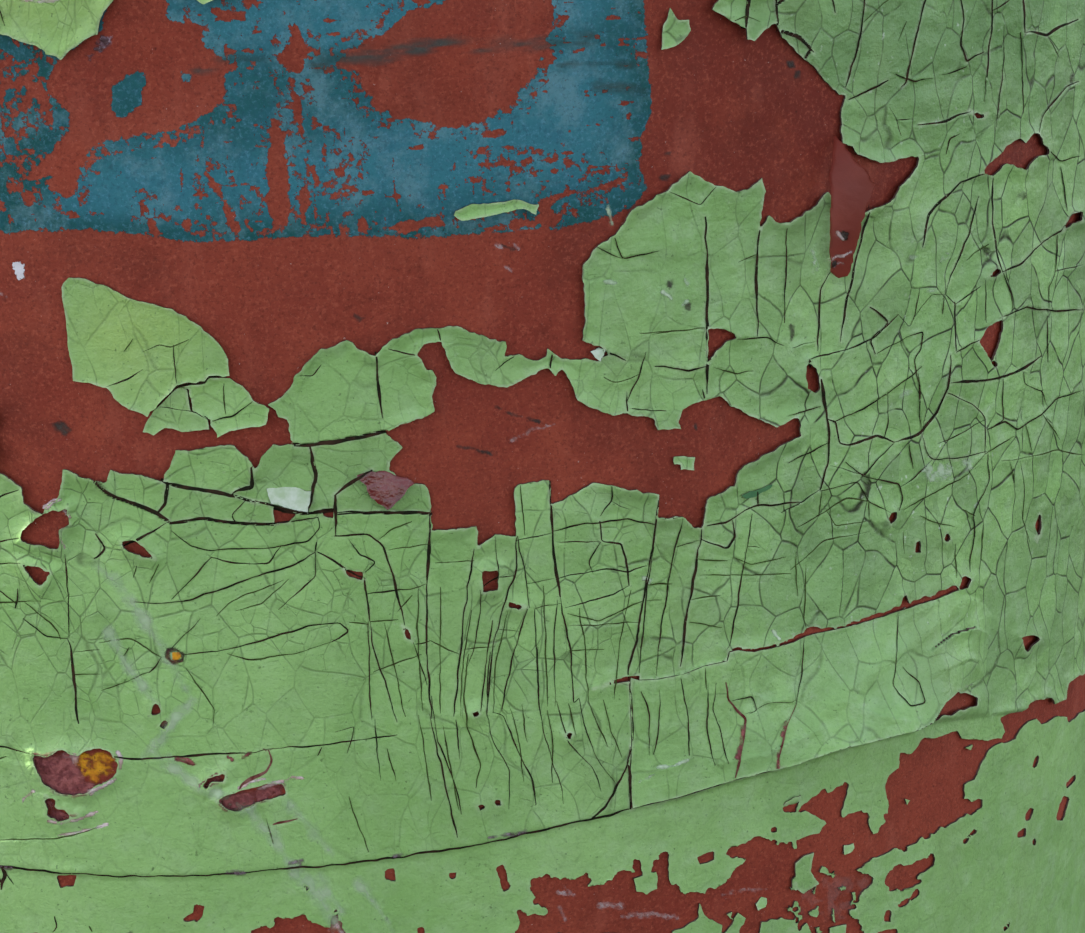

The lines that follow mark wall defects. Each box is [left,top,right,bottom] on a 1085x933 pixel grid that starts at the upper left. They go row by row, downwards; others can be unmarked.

crack [735,0,814,58]
crack [846,0,1079,154]
peeling [984,133,1047,175]
peeling [0,0,917,548]
peeling [980,320,1001,366]
peeling [24,565,50,585]
peeling [123,540,152,557]
crack [0,152,1084,890]
rust [165,648,184,664]
rust [33,753,116,821]
peeling [515,674,1085,933]
peeling [251,909,346,933]